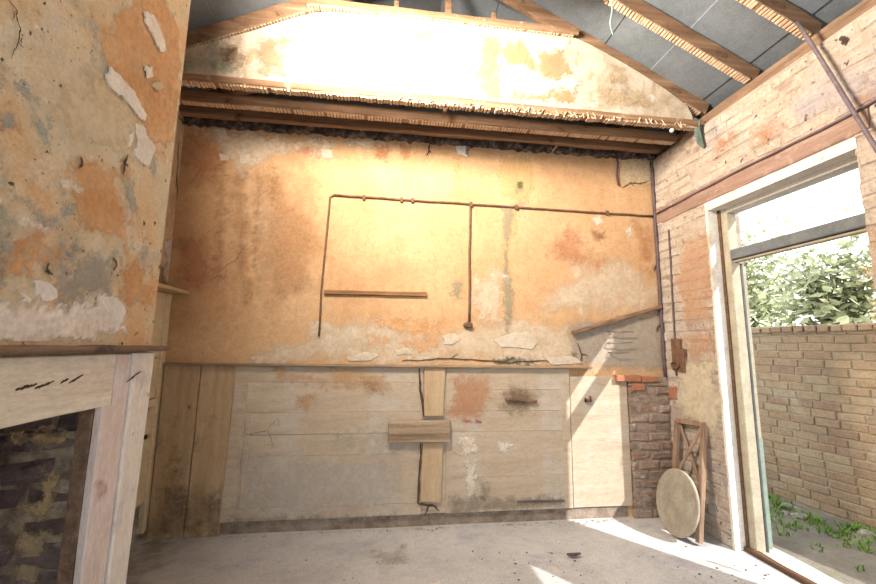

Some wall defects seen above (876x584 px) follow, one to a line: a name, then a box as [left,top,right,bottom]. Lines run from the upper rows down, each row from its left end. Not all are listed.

peeling [521,33,573,53]
peeling [61,0,180,166]
peeling [502,64,579,96]
peeling [252,313,582,366]
crack [417,443,439,515]